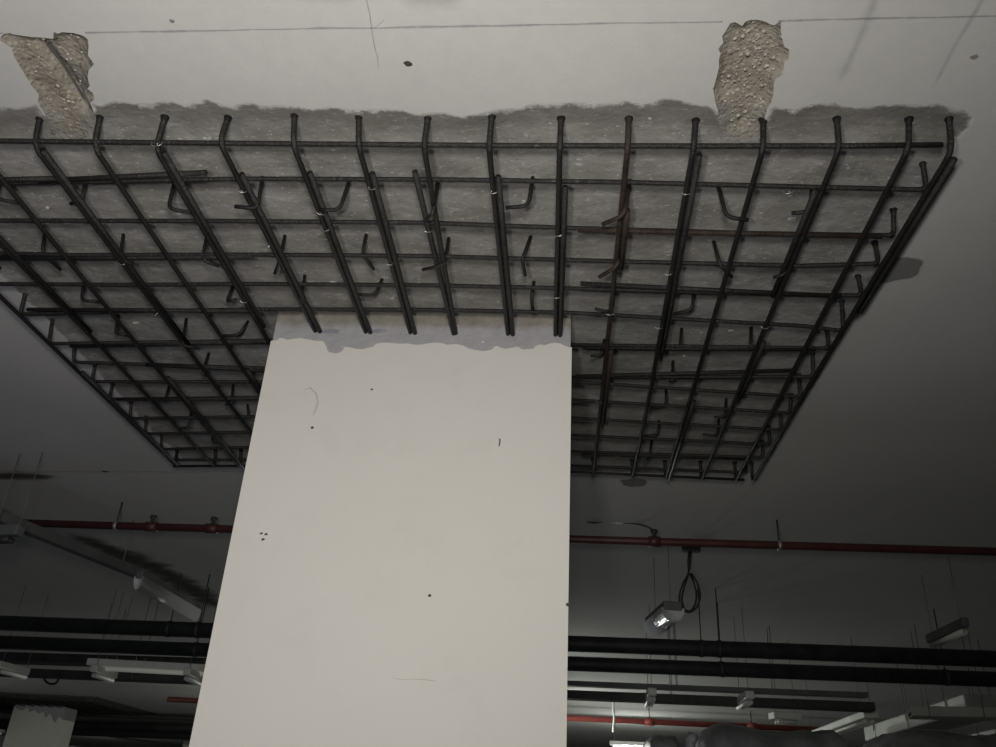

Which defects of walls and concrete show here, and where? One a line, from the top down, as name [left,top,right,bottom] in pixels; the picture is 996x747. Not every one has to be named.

spalling [0,20,975,482]